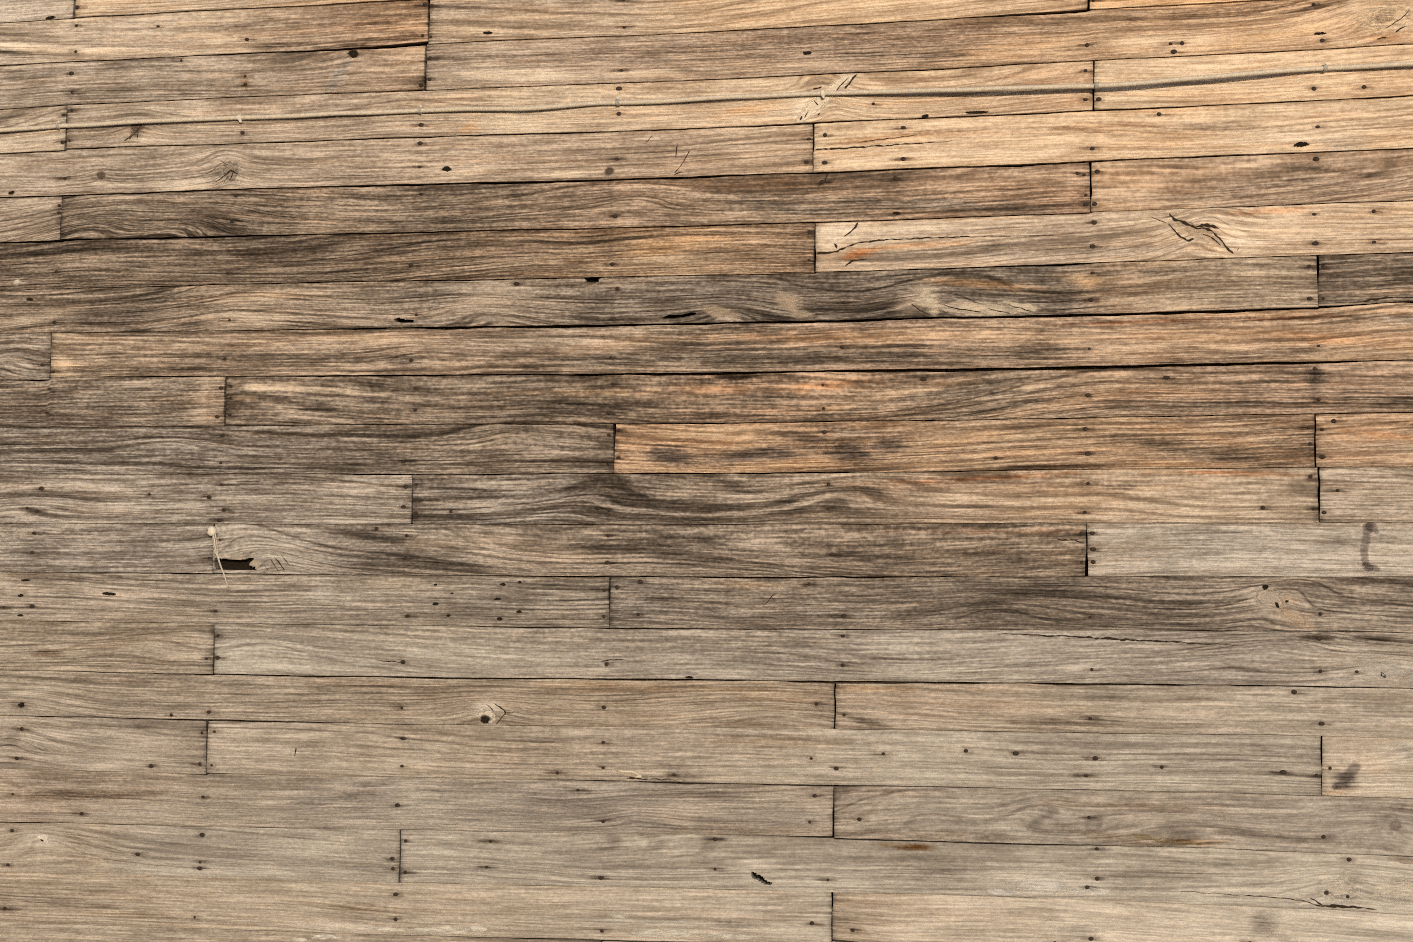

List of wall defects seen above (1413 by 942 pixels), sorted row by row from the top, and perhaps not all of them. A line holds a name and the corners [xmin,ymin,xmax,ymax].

crack [800,74,952,186]
crack [817,222,985,266]
crack [1152,213,1239,254]